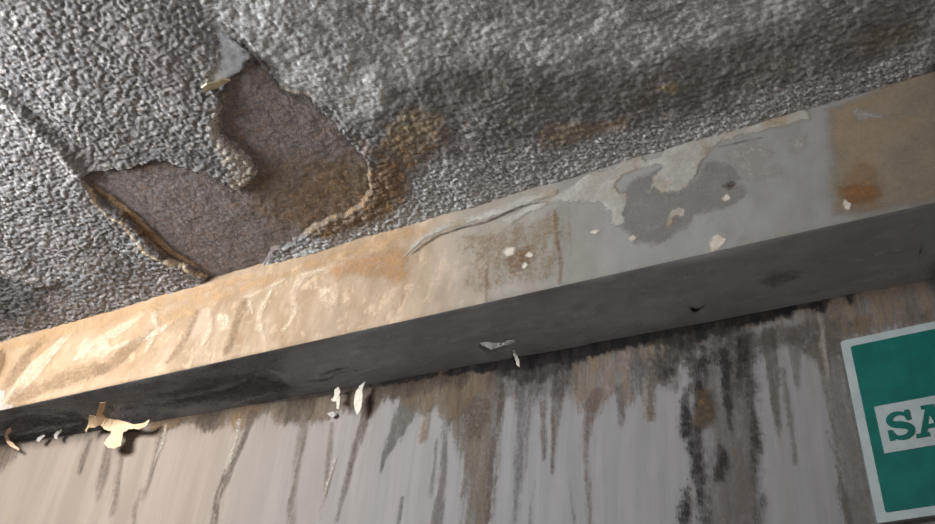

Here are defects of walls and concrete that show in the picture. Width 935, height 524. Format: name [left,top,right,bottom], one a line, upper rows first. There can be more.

spalling [82,32,371,280]
leakage [213,0,935,280]
peeling [502,109,810,227]
crack [408,189,557,254]
peeling [710,235,743,252]
peeling [480,340,520,367]
peeling [85,402,150,449]
peeling [327,387,341,418]
peeling [354,381,366,415]
leakage [0,275,935,524]